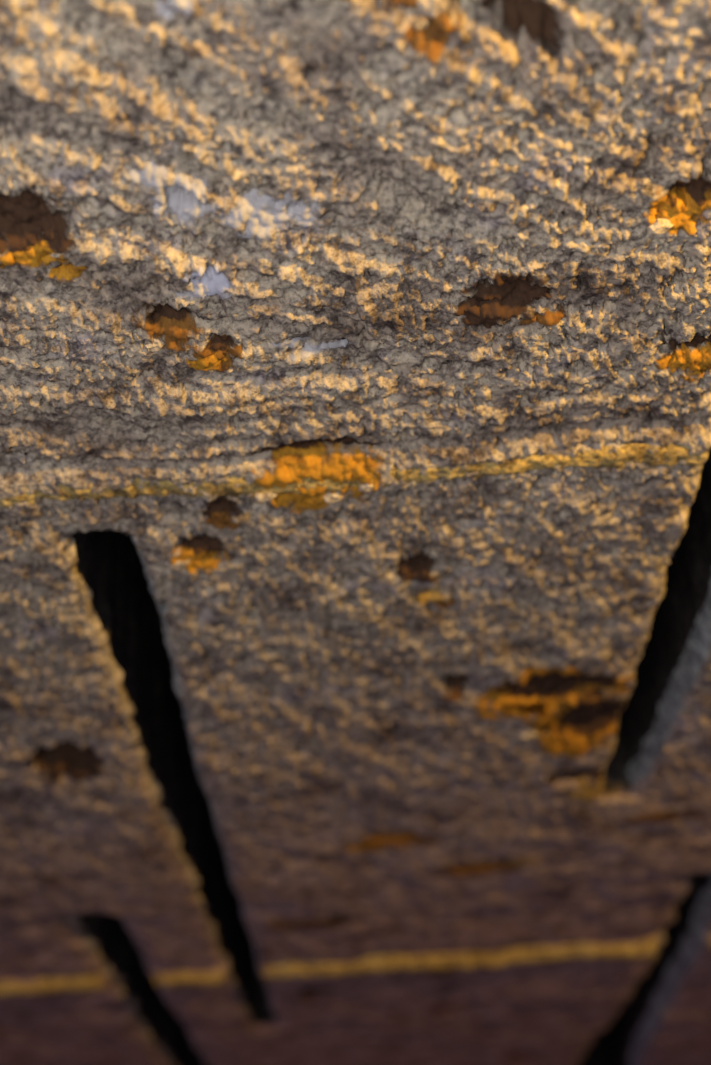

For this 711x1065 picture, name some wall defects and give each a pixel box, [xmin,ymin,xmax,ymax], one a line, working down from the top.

rust [476,665,633,801]